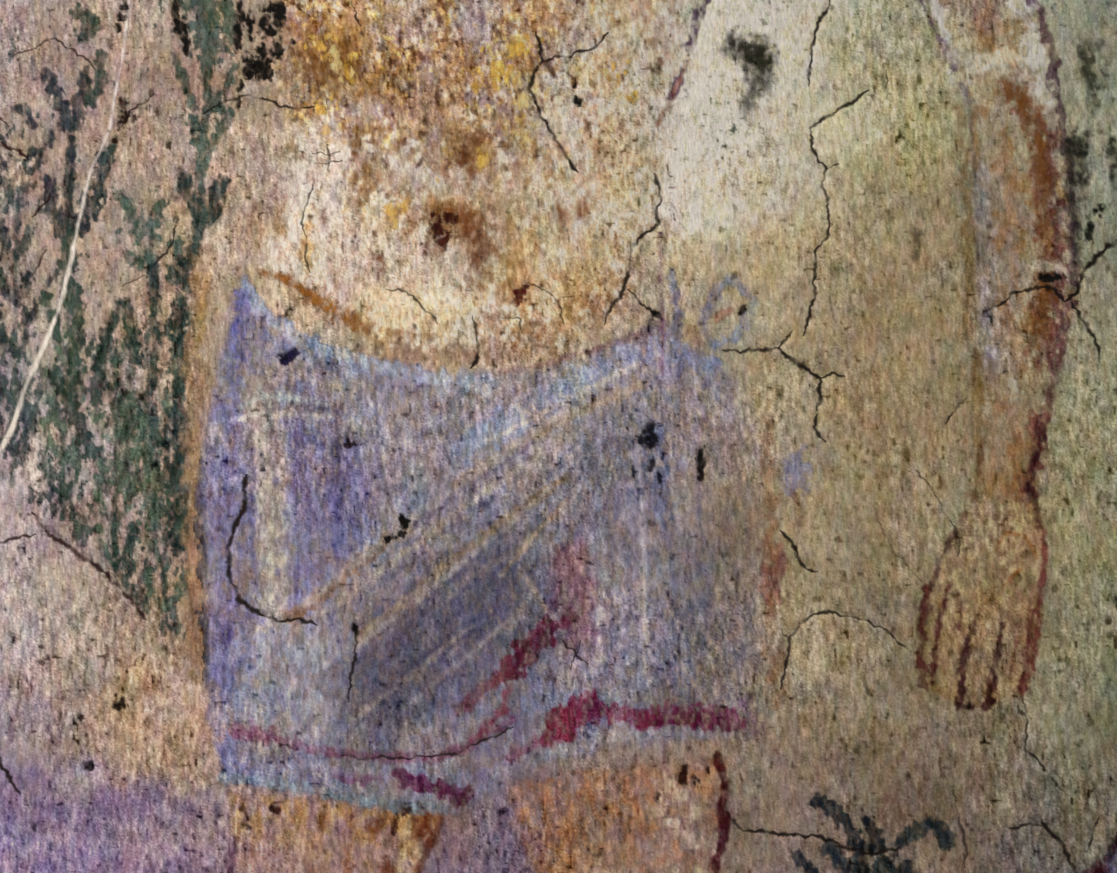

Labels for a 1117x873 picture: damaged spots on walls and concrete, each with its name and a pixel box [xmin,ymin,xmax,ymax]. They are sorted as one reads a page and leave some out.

crack [808,0,830,86]
crack [528,32,609,172]
crack [604,272,652,325]
crack [636,173,662,244]
crack [722,71,888,442]
crack [989,243,1113,363]
crack [3,512,146,620]
crack [227,474,317,625]
crack [0,757,20,794]